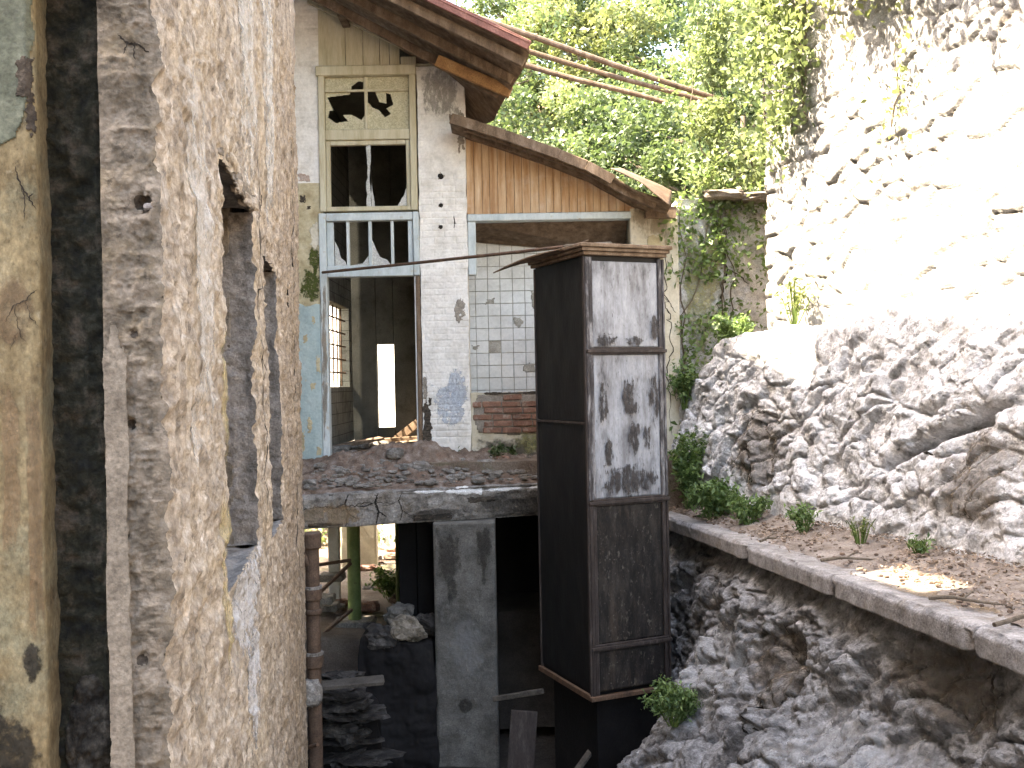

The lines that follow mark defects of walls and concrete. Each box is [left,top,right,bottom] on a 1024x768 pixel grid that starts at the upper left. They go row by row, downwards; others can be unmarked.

peeling [0,0,37,144]
crack [118,35,149,59]
crack [15,167,37,218]
crack [4,291,38,350]
flaking render [473,391,536,435]
crack [296,472,410,600]
water stain [408,508,464,601]
water stain [477,528,492,584]
water stain [23,643,41,683]
water stain [0,715,41,768]